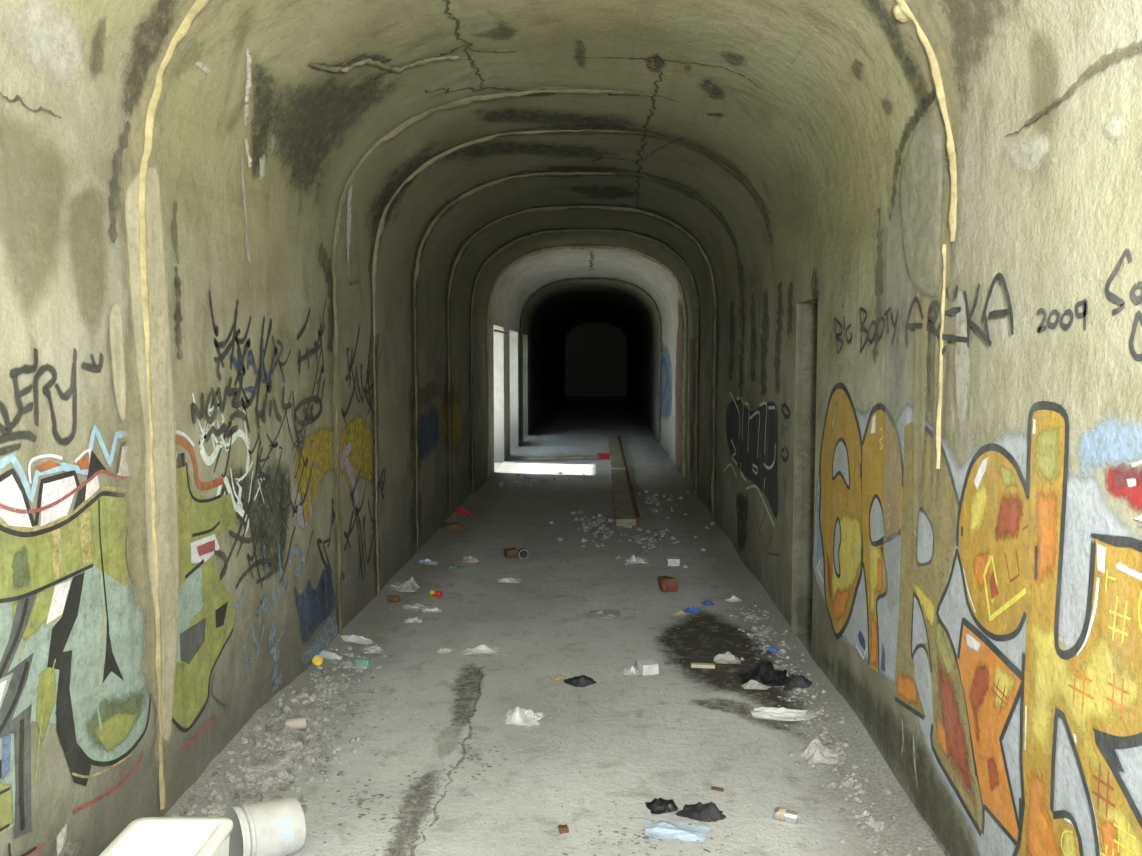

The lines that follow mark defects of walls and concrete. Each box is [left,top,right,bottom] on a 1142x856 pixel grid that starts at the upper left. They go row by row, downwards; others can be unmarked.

crack [0,93,61,118]
leakage [268,54,459,192]
crack [373,0,554,97]
crack [582,54,773,223]
crack [1005,40,1142,137]
leakage [865,0,1002,555]
leakage [109,0,228,810]